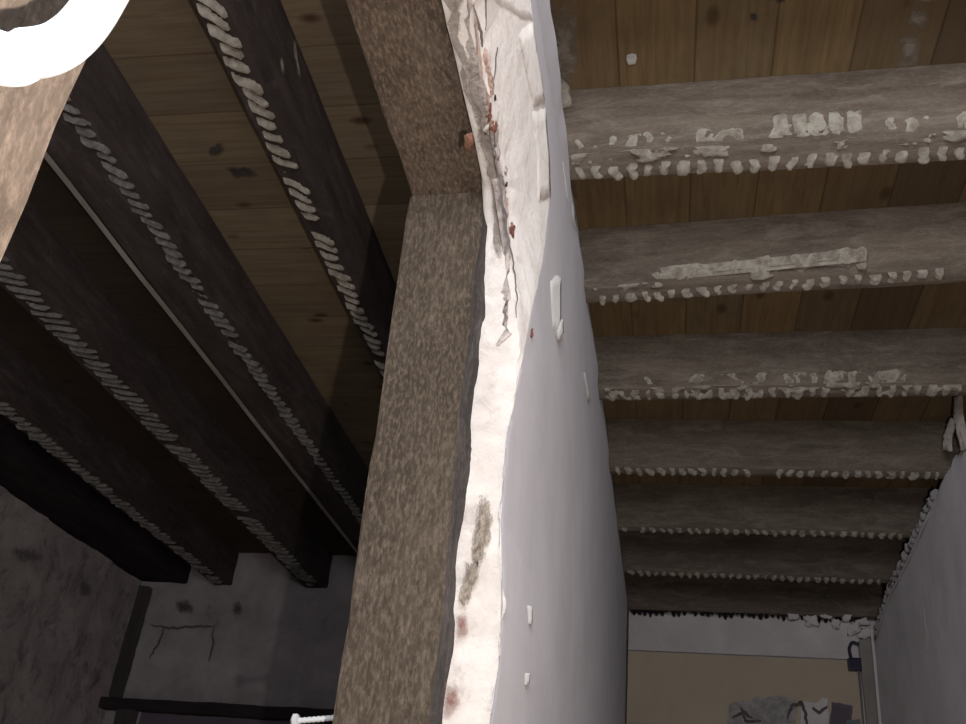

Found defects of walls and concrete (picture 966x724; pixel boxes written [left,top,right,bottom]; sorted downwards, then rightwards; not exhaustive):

flaking render [464,0,516,345]
peeling [495,0,551,202]
peeling [550,275,564,340]
crack [149,624,216,661]